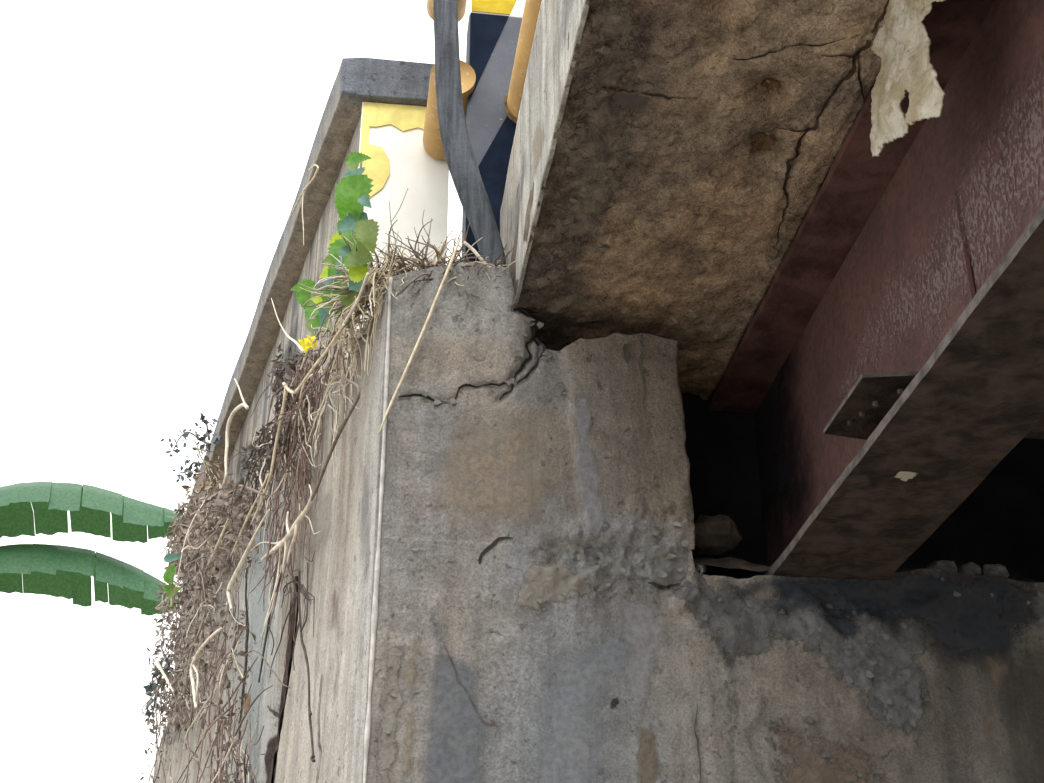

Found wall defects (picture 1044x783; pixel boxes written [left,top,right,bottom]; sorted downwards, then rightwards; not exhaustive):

crack [732,0,889,245]
crack [399,308,546,405]
crack [235,573,311,783]
leakage [731,571,1044,783]